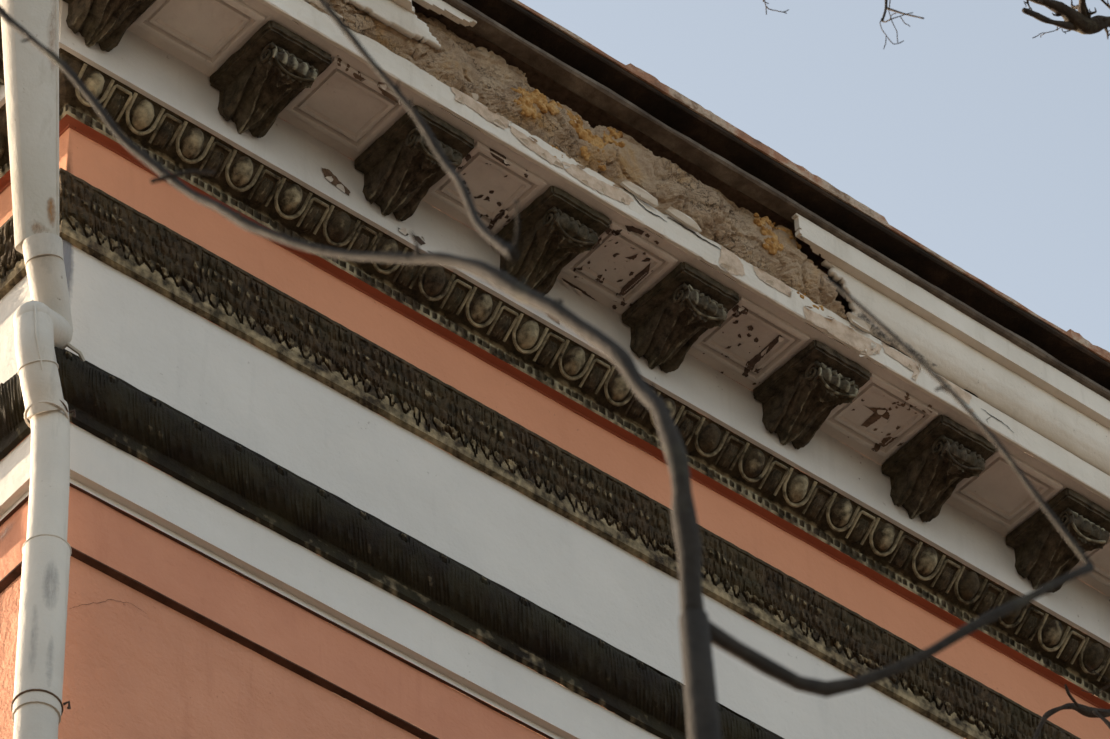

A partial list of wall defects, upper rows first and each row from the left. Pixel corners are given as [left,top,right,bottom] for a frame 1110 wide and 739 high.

spalling [309,0,921,385]
peeling [852,393,932,452]
peeling [938,375,975,412]